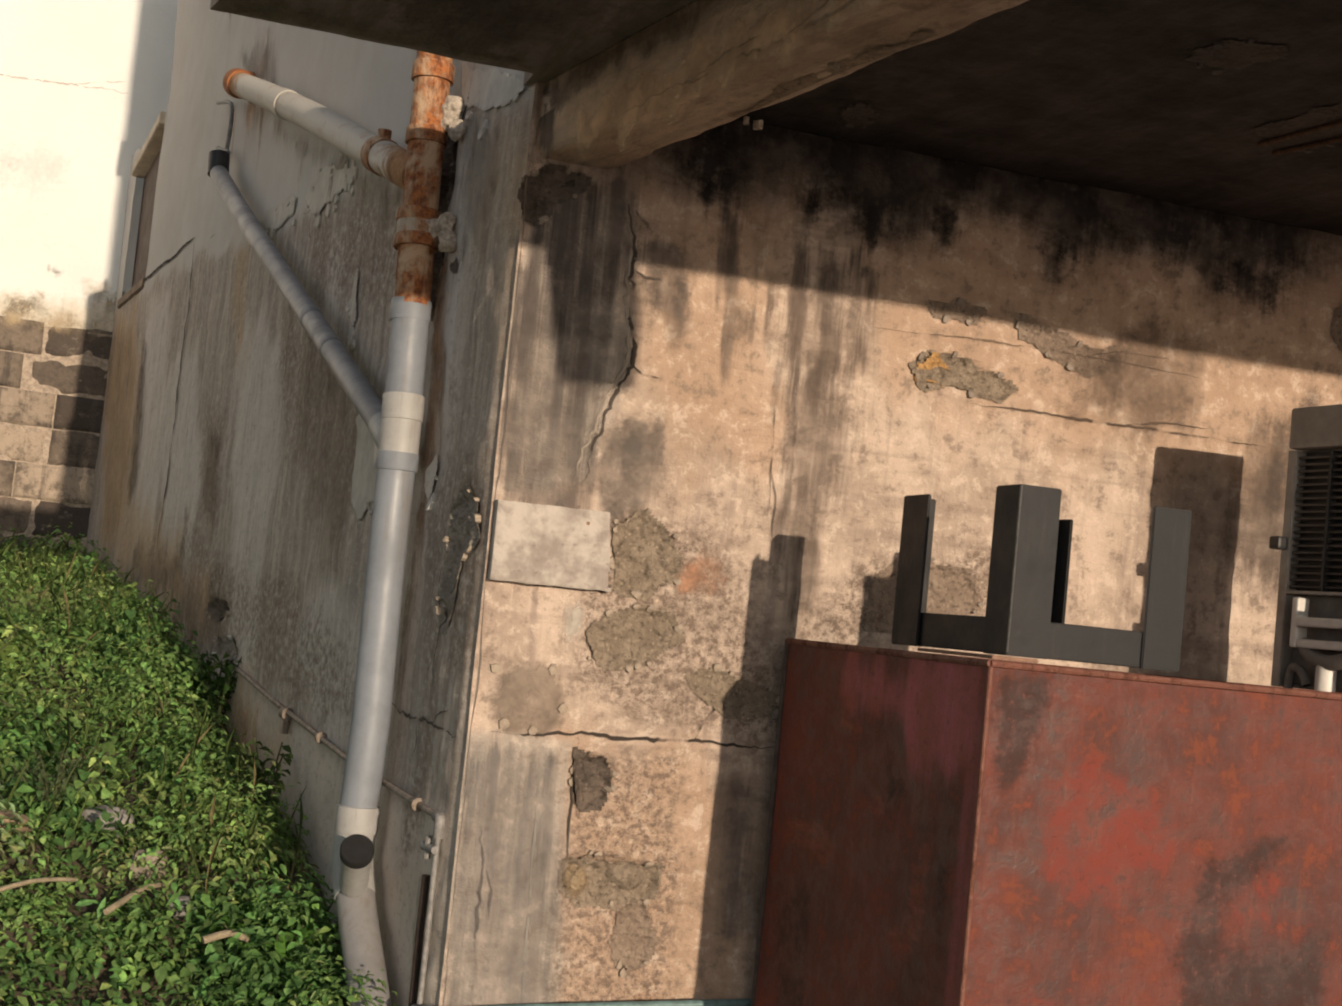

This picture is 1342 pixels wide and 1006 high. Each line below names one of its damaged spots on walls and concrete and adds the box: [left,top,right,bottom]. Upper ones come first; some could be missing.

peeling [260,159,358,239]
spalling [517,163,599,226]
damp [932,206,957,246]
crack [144,238,194,542]
crack [575,205,662,479]
spalling [909,350,1018,404]
spalling [1011,309,1123,378]
peeling [351,415,378,519]
spalling [434,481,482,637]
spalling [567,747,617,813]
crack [491,709,771,861]
spalling [557,849,665,977]